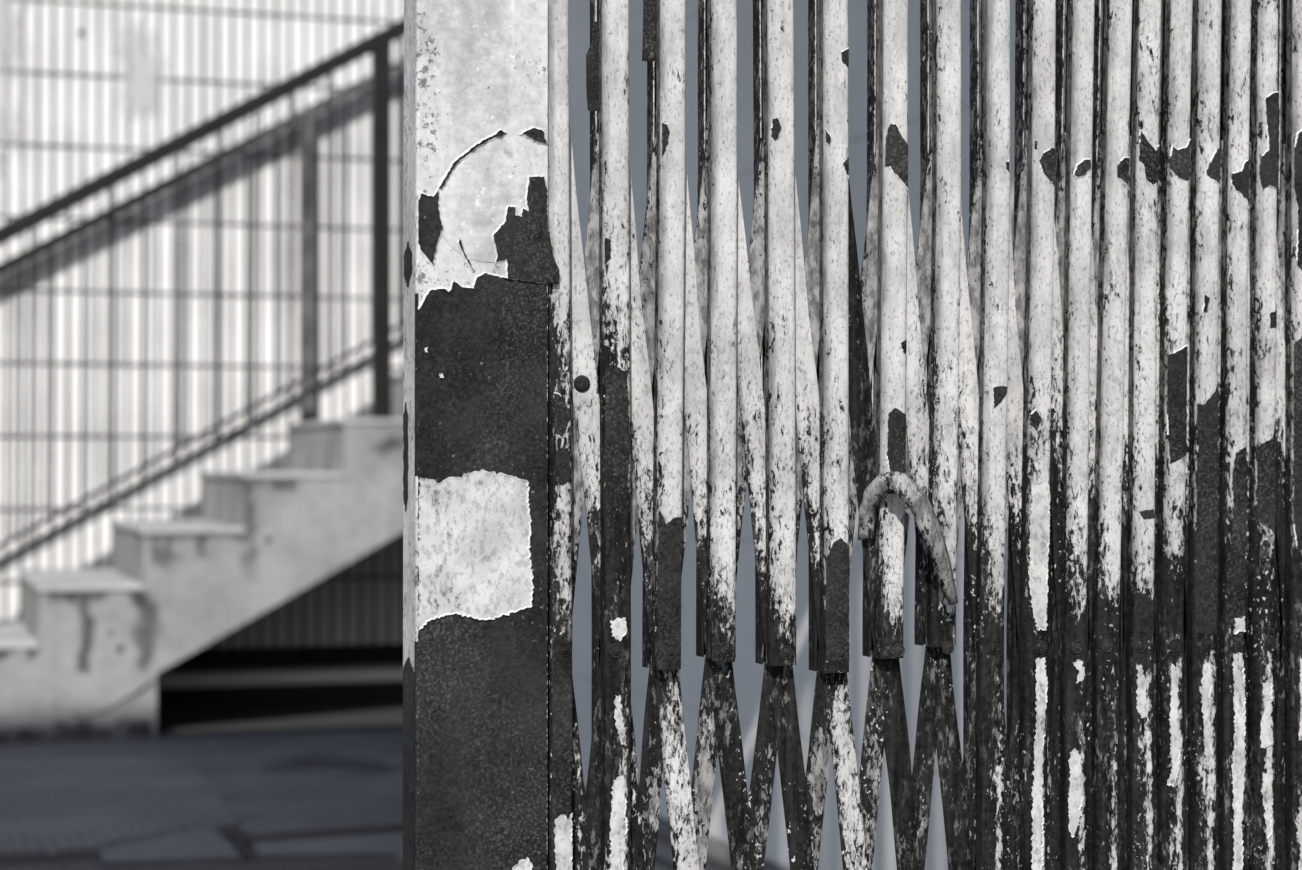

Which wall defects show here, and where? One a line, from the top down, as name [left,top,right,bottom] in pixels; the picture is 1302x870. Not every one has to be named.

peeling [402,126,573,870]